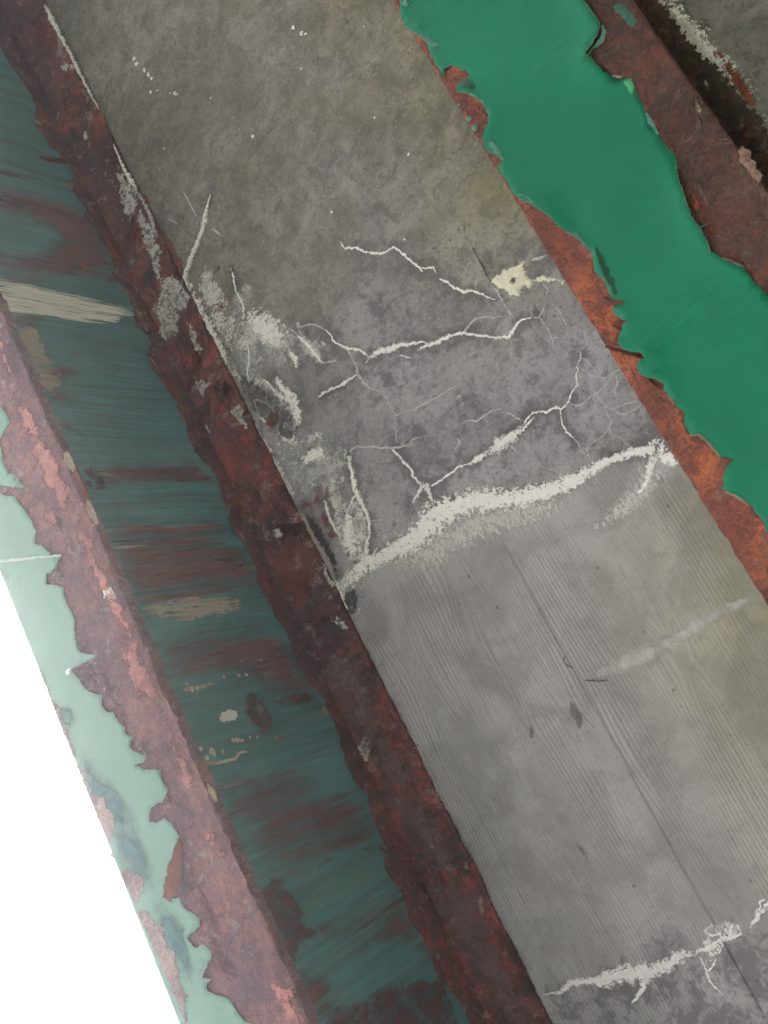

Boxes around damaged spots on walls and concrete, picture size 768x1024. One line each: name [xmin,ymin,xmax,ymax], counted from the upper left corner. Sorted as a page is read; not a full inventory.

corrosion [640,0,768,183]
crack [289,241,640,505]
peeling [410,0,768,605]
corrosion [17,406,208,789]
peeling [0,1,491,1024]
corrosion [246,692,316,741]
corrosion [32,672,188,1023]
corrosion [163,838,236,980]
corrosion [270,980,302,1024]
corrosion [262,878,329,963]
corrosion [330,979,458,1024]